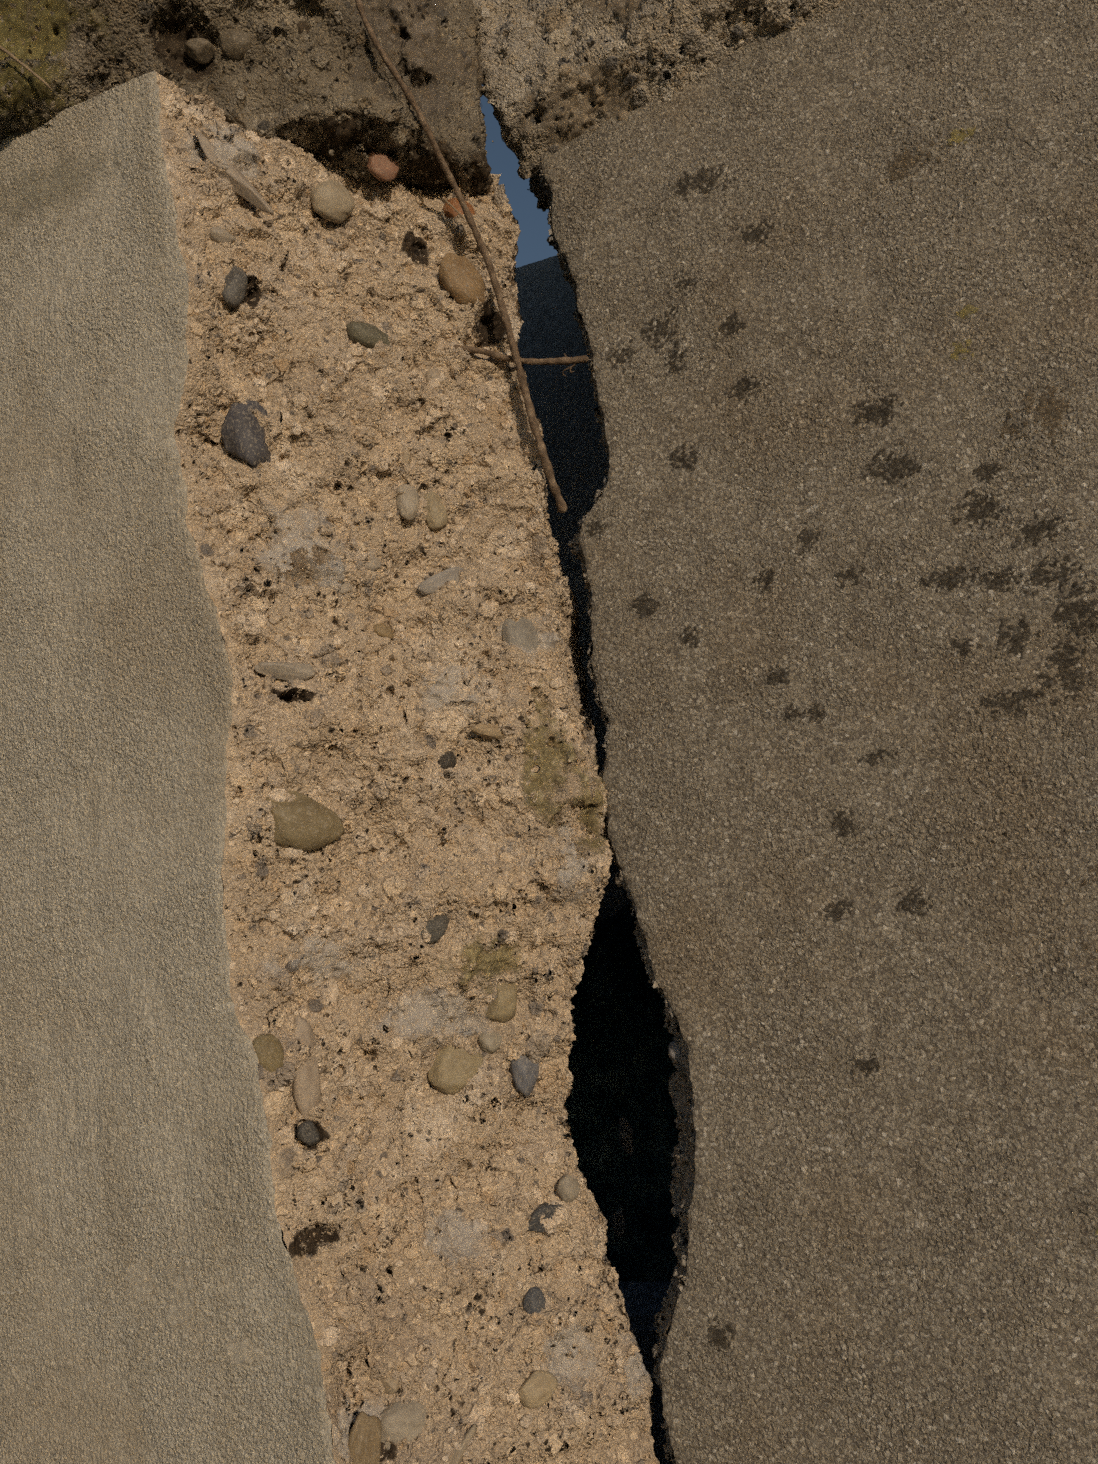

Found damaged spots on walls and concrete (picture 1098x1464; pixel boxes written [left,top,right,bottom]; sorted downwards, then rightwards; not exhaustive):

spalling [537,165,610,782]
spalling [604,807,696,1395]
spalling [661,1419,676,1464]